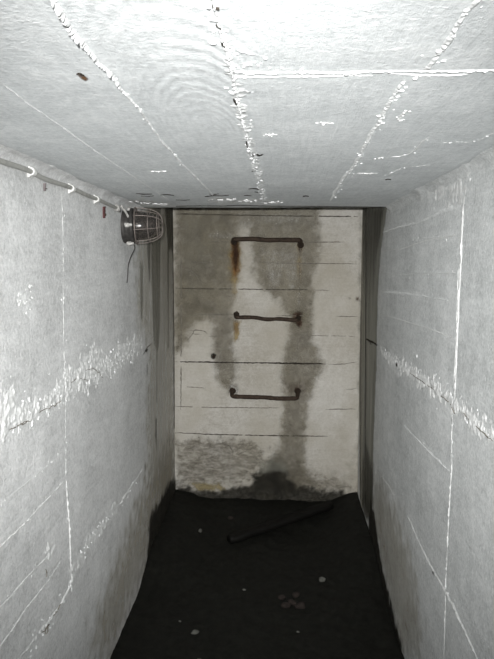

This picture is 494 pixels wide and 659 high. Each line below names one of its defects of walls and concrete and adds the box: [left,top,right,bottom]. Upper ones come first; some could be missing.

corrosion [230,241,239,283]
water stain [165,207,320,489]